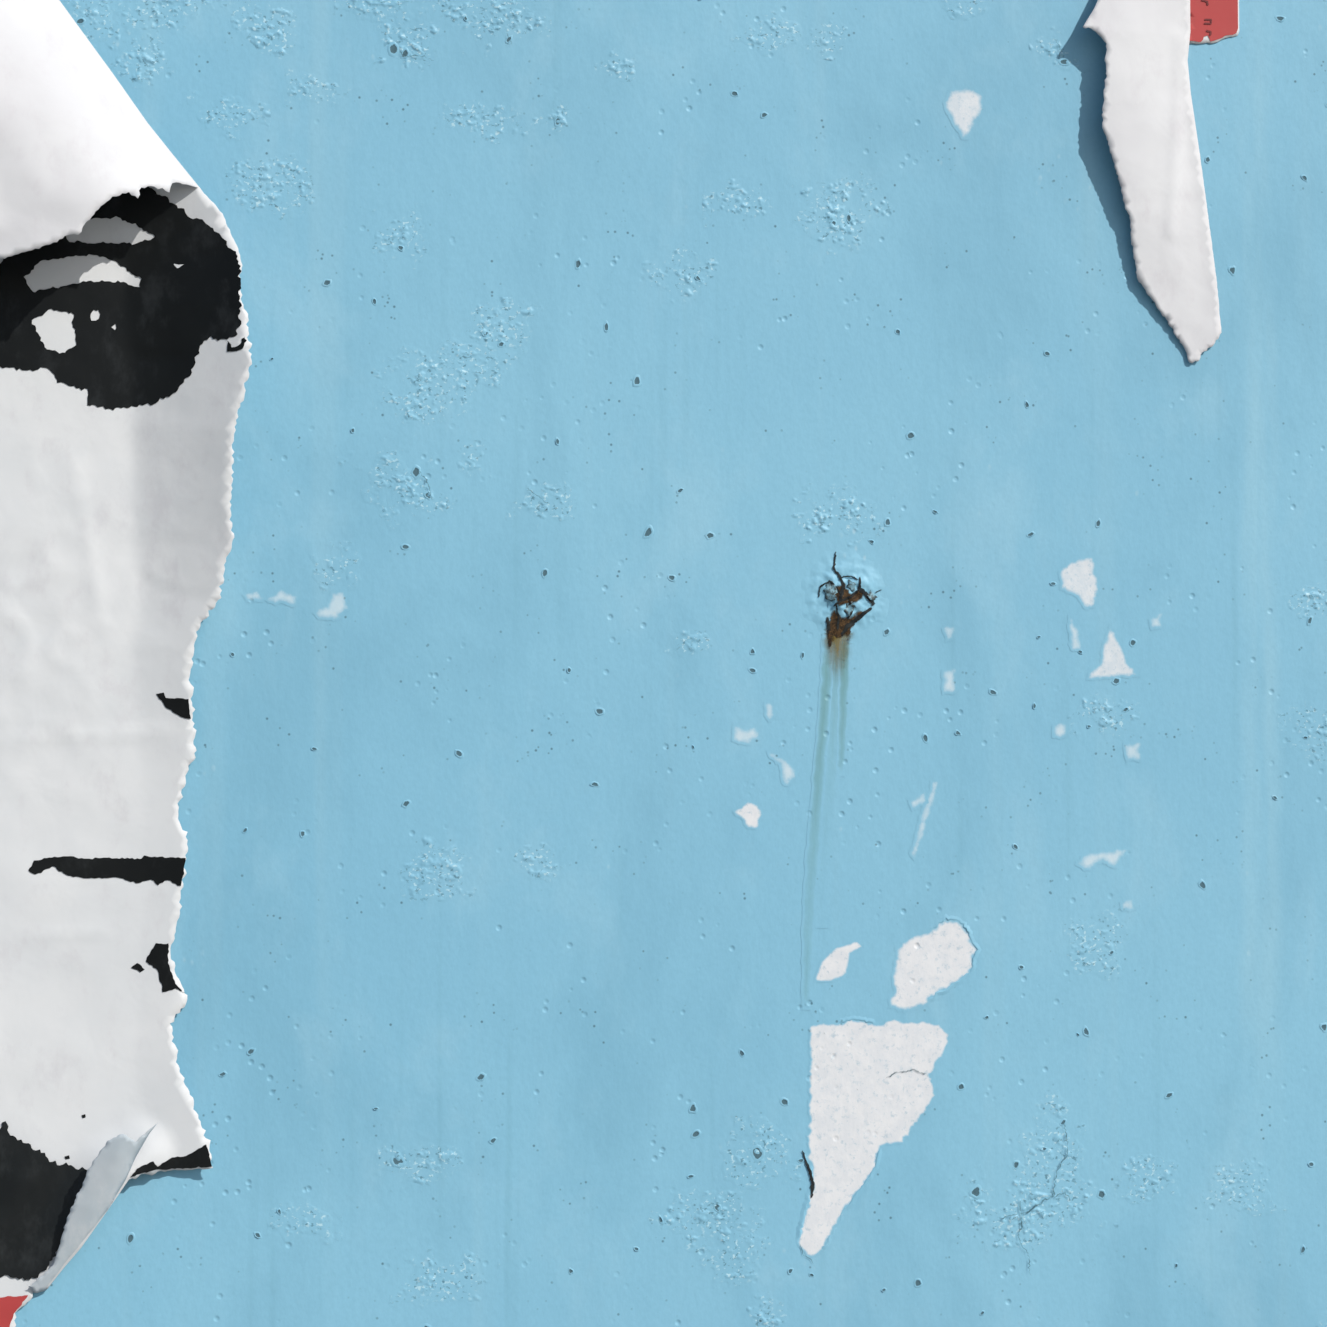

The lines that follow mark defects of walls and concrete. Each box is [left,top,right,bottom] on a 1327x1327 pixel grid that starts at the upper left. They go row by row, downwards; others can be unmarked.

peeling [943,85,985,140]
peeling [1049,555,1101,610]
peeling [1086,626,1140,686]
spalling [787,914,982,1277]
crack [1002,1122,1068,1271]